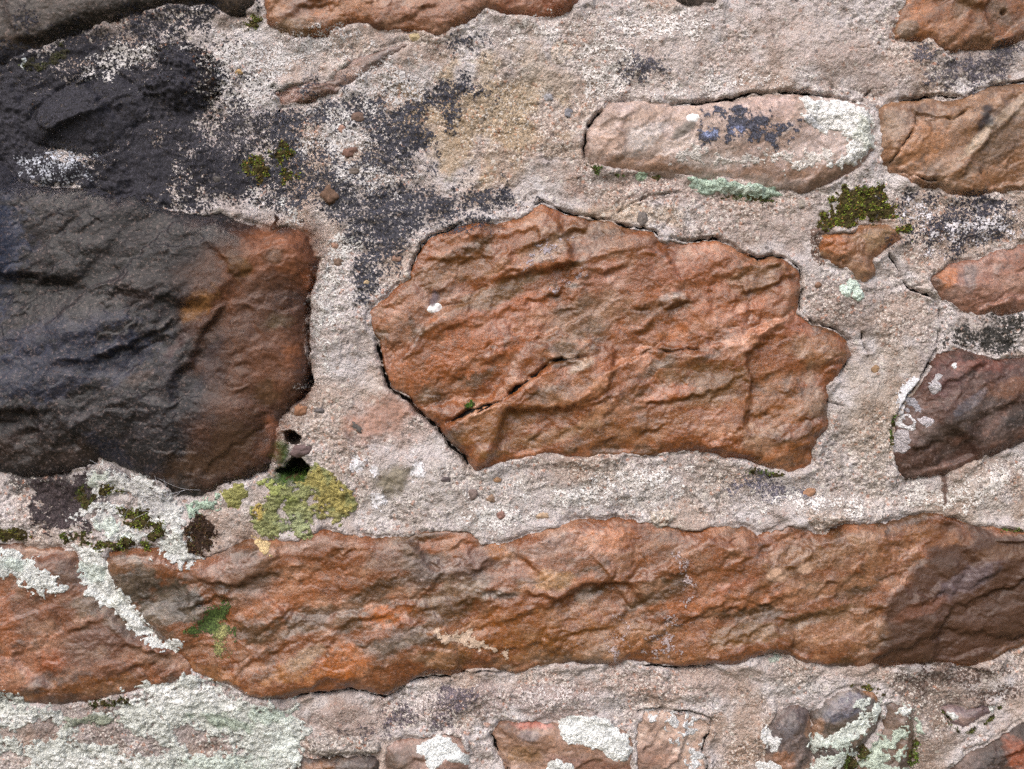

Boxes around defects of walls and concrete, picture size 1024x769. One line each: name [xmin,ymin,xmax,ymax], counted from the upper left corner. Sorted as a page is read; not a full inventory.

crack [376,339,582,464]